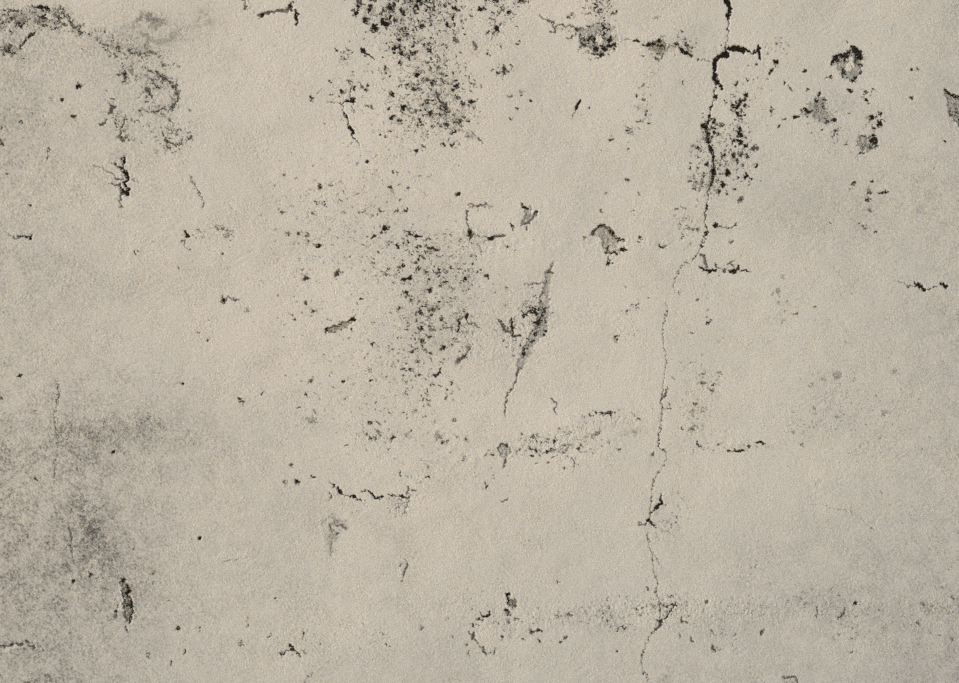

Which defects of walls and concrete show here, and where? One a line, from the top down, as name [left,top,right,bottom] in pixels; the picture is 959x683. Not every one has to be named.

spalling [826,41,874,103]
spalling [583,209,628,266]
crack [901,282,948,292]
crack [638,0,762,681]
crack [329,484,416,516]
spalling [113,578,134,631]